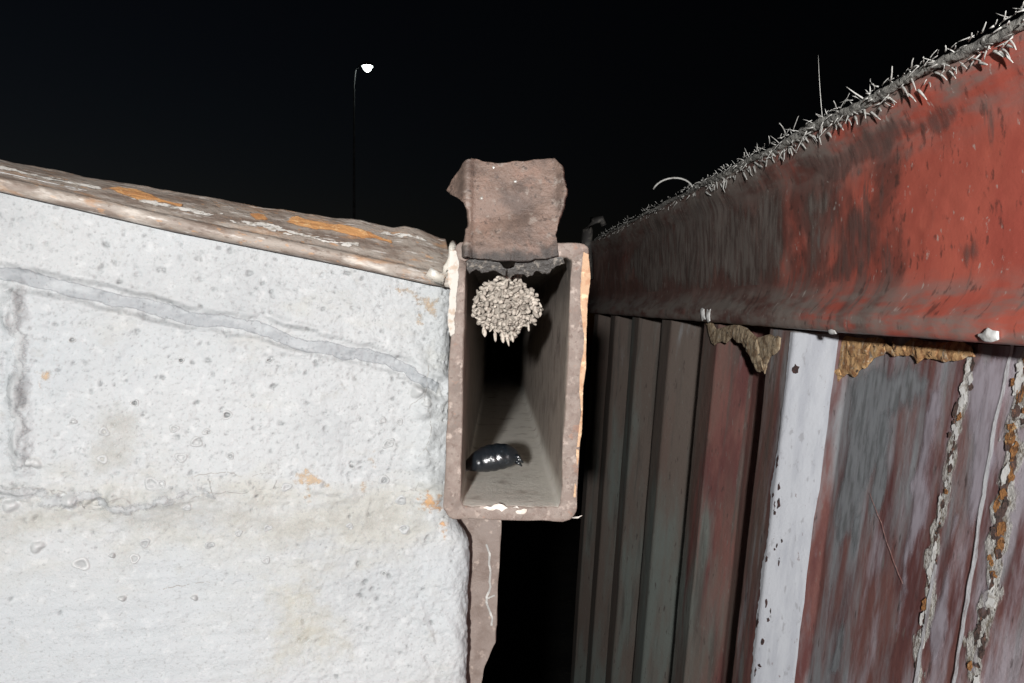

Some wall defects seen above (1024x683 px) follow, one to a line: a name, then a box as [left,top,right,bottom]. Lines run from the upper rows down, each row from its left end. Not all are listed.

corrosion [110,186,182,207]
corrosion [287,216,392,243]
peeling [743,337,764,370]
peeling [892,342,941,358]
crack [191,472,290,499]
peeling [913,342,976,683]